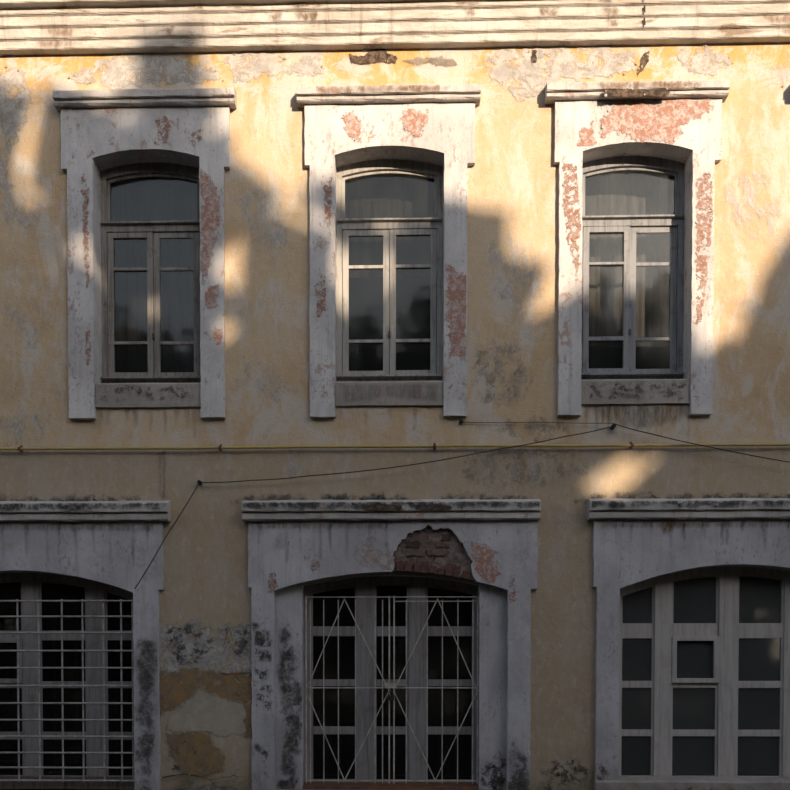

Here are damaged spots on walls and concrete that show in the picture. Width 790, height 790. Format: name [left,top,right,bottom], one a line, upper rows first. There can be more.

peeling [0,64,33,153]
peeling [68,51,323,89]
peeling [342,109,363,143]
peeling [400,108,429,138]
peeling [484,46,650,102]
peeling [577,88,714,146]
peeling [200,168,220,309]
peeling [562,163,582,271]
peeling [695,172,713,324]
flaking render [387,525,517,602]
peeling [159,668,252,738]
water stain [136,619,302,790]